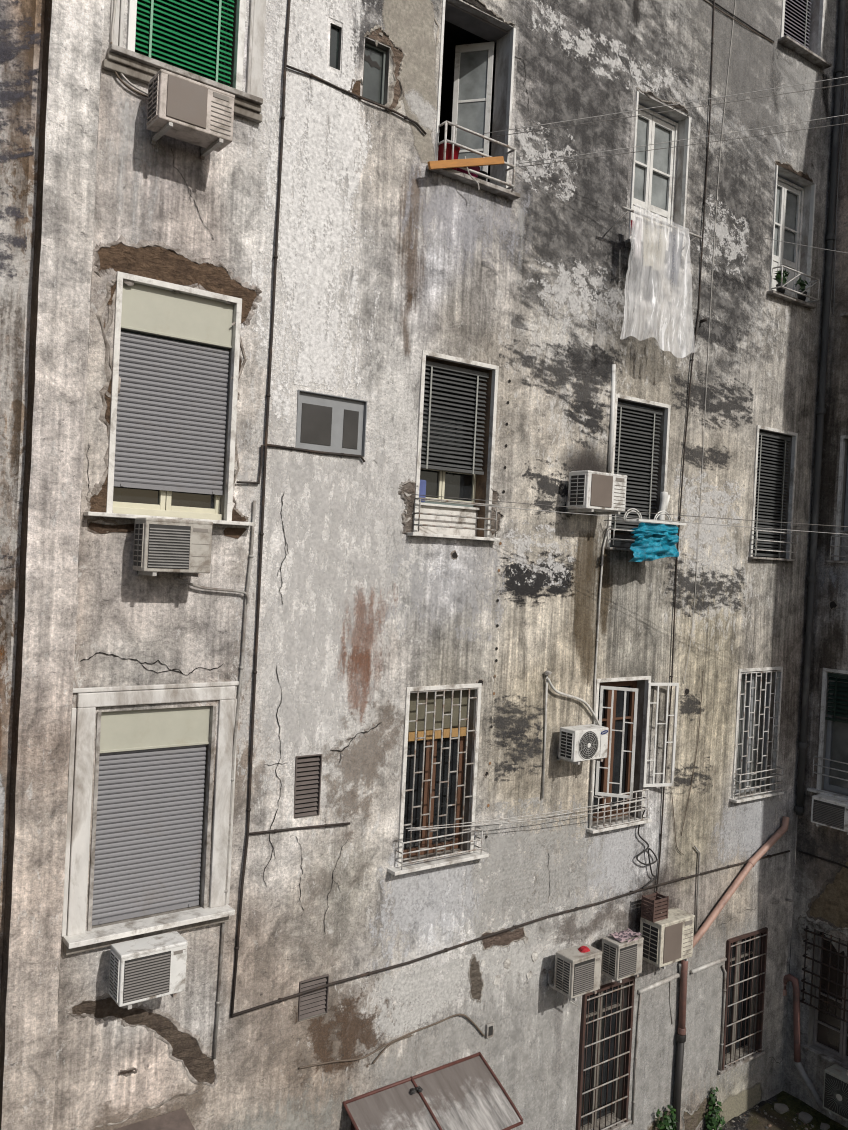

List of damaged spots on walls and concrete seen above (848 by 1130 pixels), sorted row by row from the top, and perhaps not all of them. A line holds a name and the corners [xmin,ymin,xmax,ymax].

flaking render [348,78,363,101]
flaking render [364,24,407,115]
water stain [487,0,797,448]
corrosion [1,311,23,494]
flaking render [85,234,262,539]
water stain [498,459,612,683]
water stain [664,442,745,617]
crack [80,652,224,675]
water stain [484,695,545,781]
flaking render [806,859,848,931]
flaking render [67,993,218,1130]
flaking render [647,1093,716,1130]